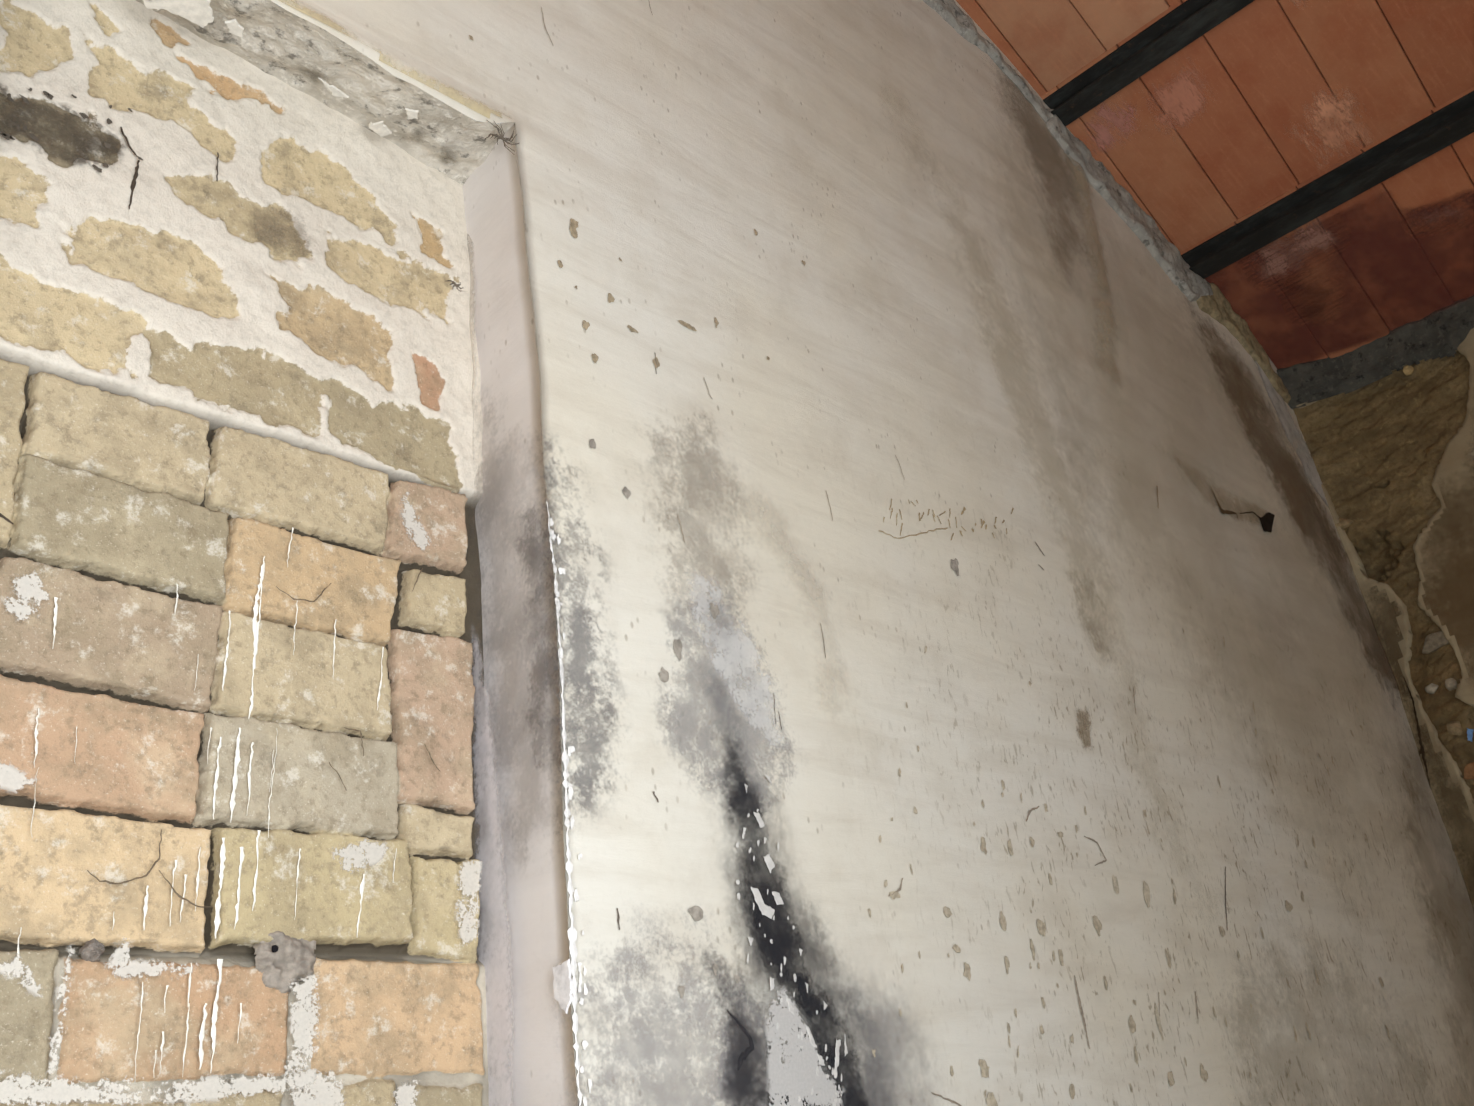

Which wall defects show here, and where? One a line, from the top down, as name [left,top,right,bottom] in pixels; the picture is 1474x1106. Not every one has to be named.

spalling [136,0,515,185]
leakage [1090,72,1205,150]
leakage [1294,93,1364,152]
flaking render [1293,351,1474,800]